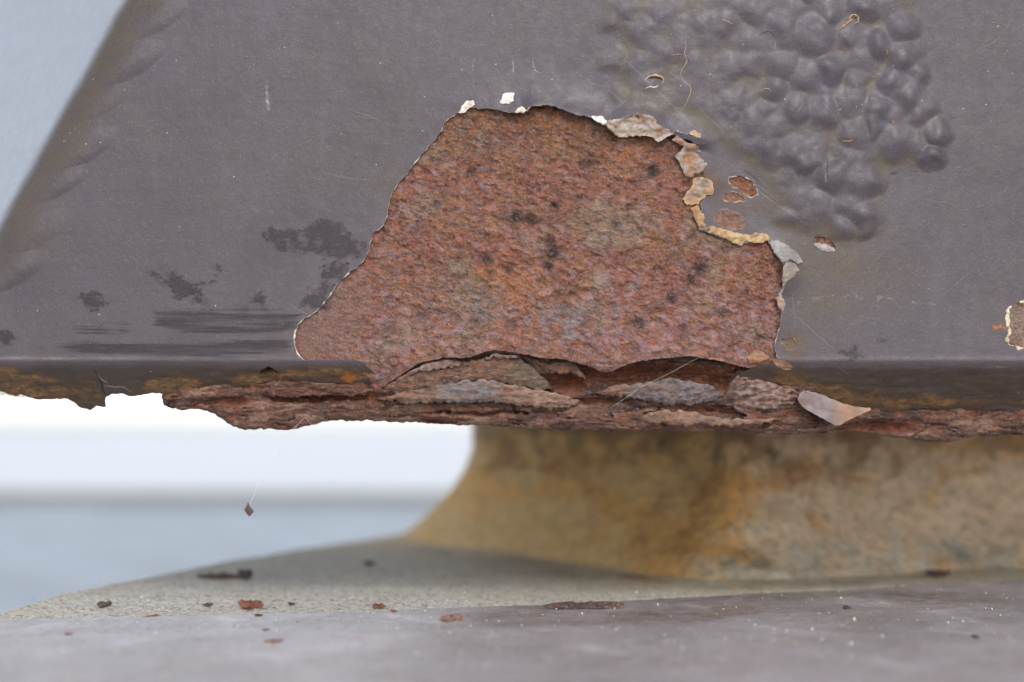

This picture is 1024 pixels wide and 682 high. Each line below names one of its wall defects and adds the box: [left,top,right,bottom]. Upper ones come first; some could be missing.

spalling [713,176,758,230]
rust [233,92,956,429]
damp [67,219,366,356]
spalling [1005,300,1024,350]
spalling [773,337,797,370]
rust [141,376,205,393]
rust [925,569,952,577]